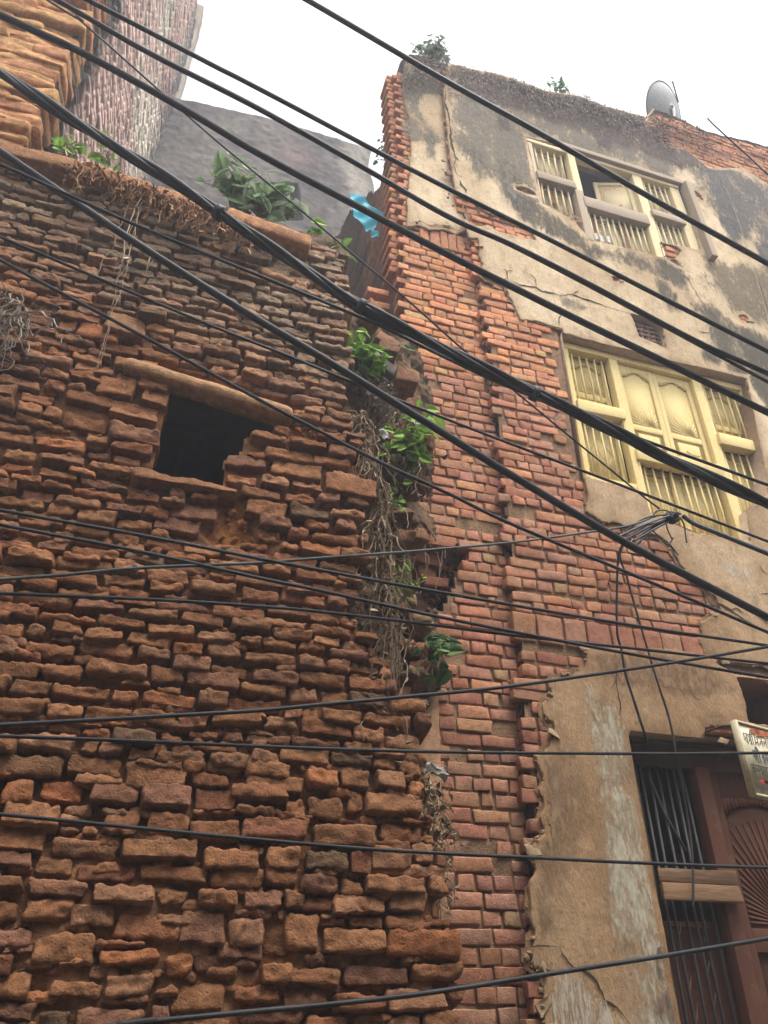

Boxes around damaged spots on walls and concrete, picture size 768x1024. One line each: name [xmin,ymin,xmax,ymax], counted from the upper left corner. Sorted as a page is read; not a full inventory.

crack [442,87,467,192]
flaking render [647,112,768,184]
flaking render [409,192,535,240]
flaking render [546,190,602,233]
water stain [401,65,768,408]
crack [476,280,491,355]
flaking render [478,263,561,331]
crack [503,268,628,324]
spalling [403,555,463,616]
crack [523,804,533,878]
flaking render [522,646,588,1024]
crack [526,923,628,1021]